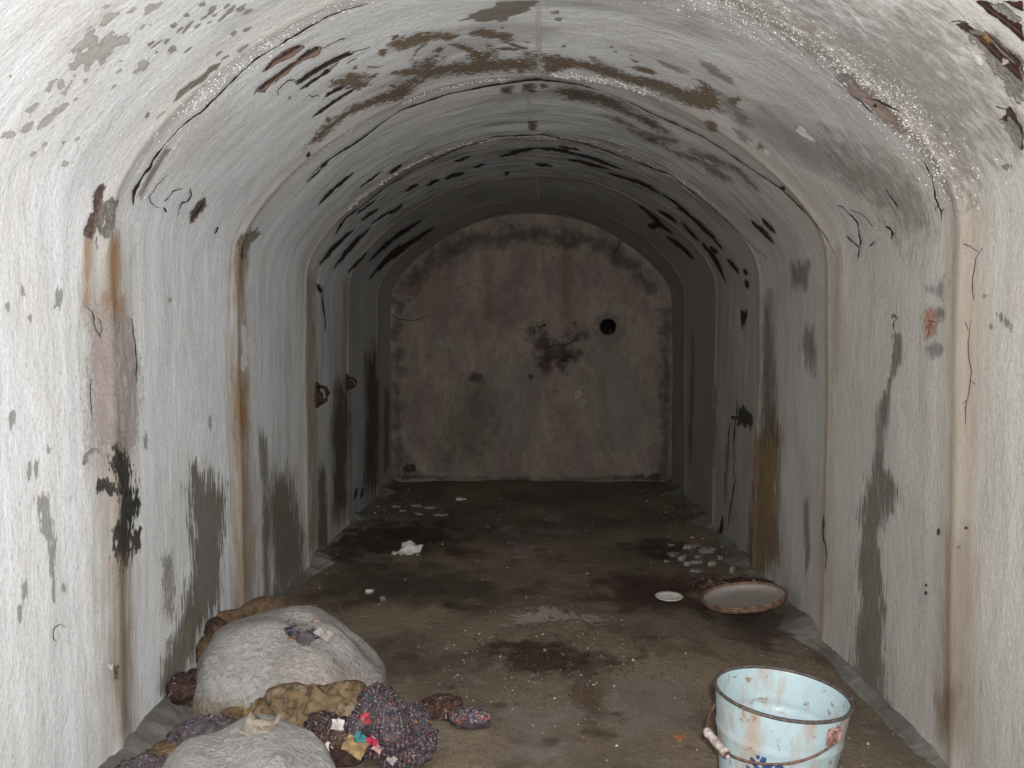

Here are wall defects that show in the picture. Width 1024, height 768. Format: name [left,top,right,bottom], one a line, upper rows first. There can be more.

spalling [84,183,119,249]
peeling [0,1,253,139]
crack [132,3,368,214]
peeling [254,26,741,158]
crack [311,78,898,259]
spalling [952,0,1024,150]
crack [962,244,982,424]
damp [96,437,142,577]
damp [160,457,231,695]
rust [236,370,255,606]
rust [747,411,781,577]
damp [848,313,901,709]